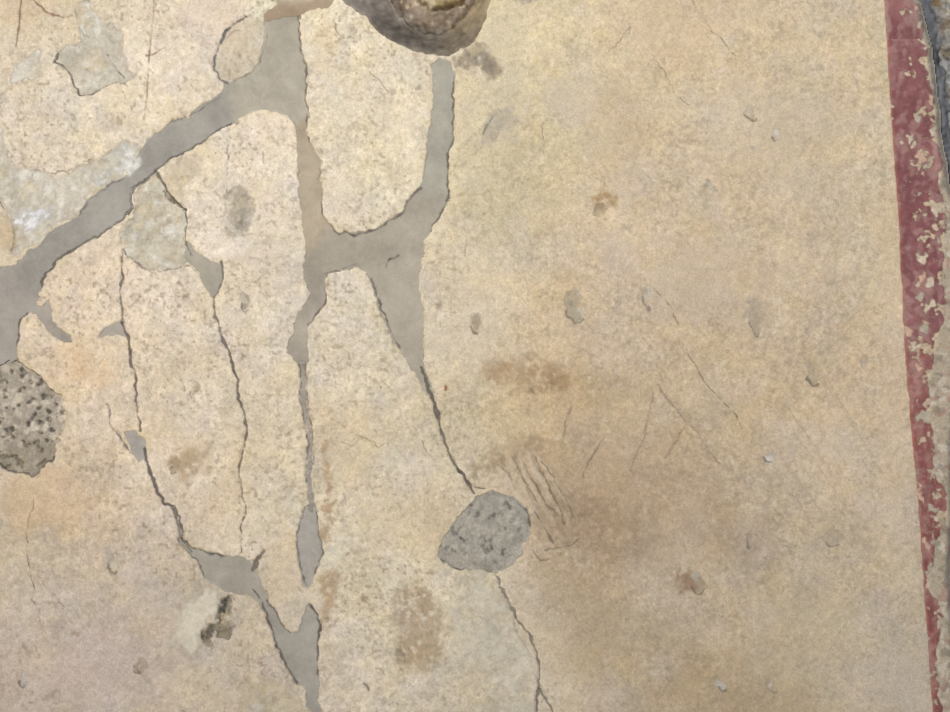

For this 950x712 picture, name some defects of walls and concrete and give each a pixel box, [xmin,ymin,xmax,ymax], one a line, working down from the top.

peeling [54,1,132,96]
spalling [343,0,501,74]
peeling [0,127,137,256]
spalling [119,172,188,271]
spalling [229,190,253,232]
crack [0,16,485,512]
peeling [916,253,936,311]
spalling [0,360,67,478]
crack [107,256,323,712]
peeling [904,324,946,712]
spalling [201,597,235,648]
crack [496,576,553,712]